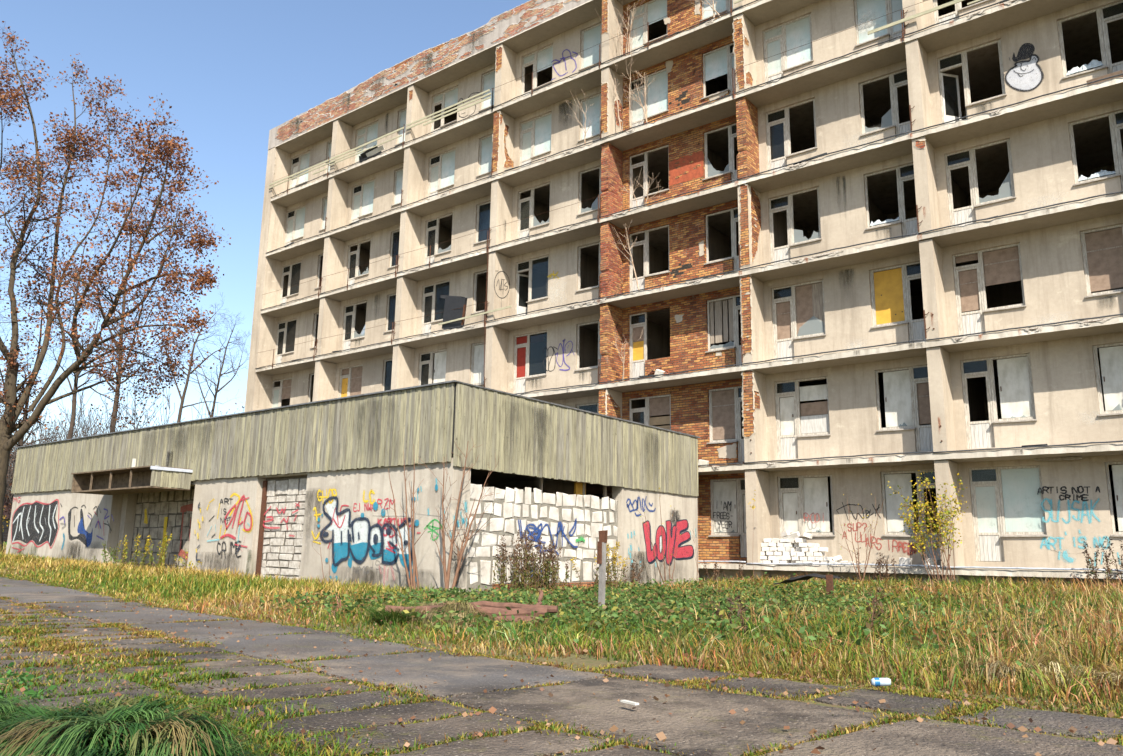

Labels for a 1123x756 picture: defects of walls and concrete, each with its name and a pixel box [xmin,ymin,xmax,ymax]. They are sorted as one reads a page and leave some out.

flaking render [601,0,609,35]
flaking render [732,17,753,91]
flaking render [267,0,581,186]
flaking render [600,82,635,135]
peeling [669,150,704,186]